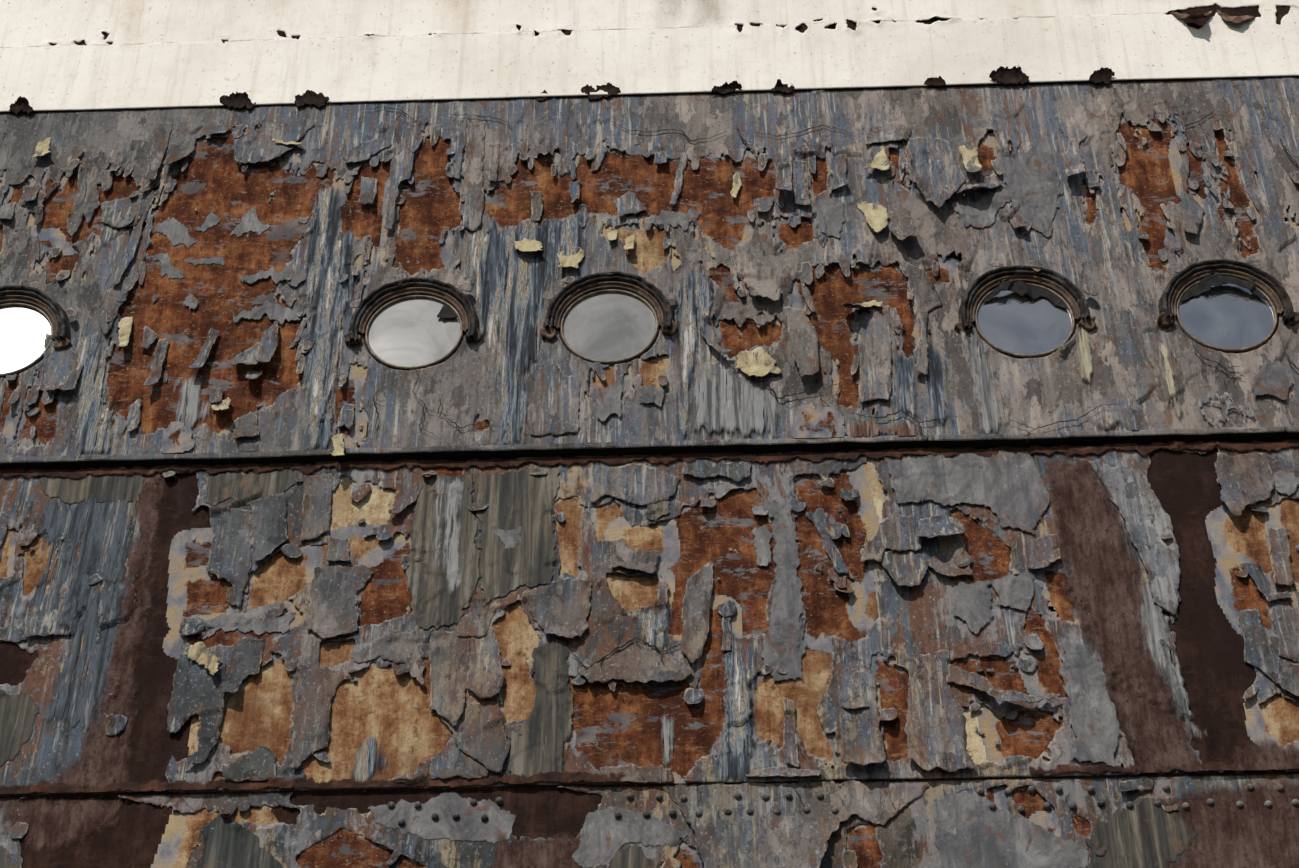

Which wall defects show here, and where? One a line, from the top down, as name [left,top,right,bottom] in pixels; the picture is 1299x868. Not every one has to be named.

corrosion [220,91,256,110]
corrosion [294,90,329,108]
corrosion [1080,104,1262,274]
peeling [69,119,315,439]
corrosion [0,123,825,453]
corrosion [789,256,930,438]
peeling [167,603,523,782]
corrosion [0,439,1299,868]
peeling [579,561,732,684]
peeling [600,650,1060,868]
peeling [805,460,973,587]
peeling [1087,459,1181,615]